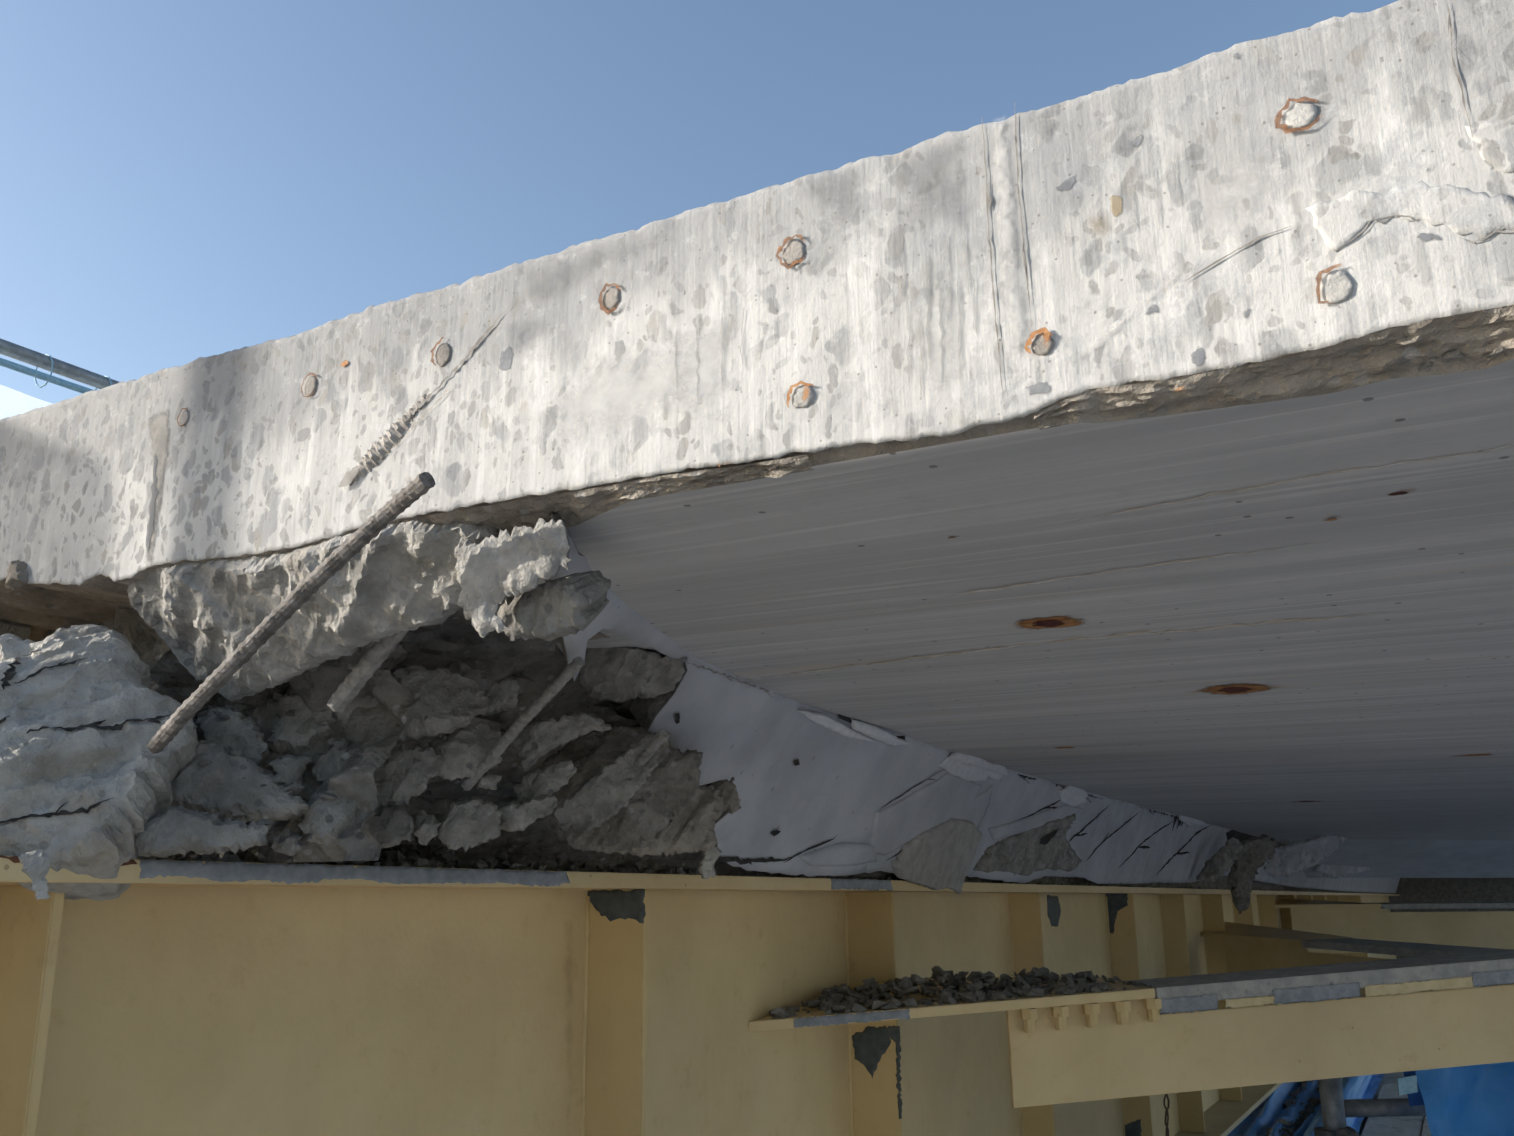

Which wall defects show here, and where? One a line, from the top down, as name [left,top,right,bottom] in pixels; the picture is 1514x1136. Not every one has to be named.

corrosion [1275,97,1319,134]
crack [1338,210,1422,249]
corrosion [598,283,620,314]
corrosion [1316,263,1354,304]
corrosion [1024,327,1055,356]
corrosion [786,381,815,408]
spalling [147,454,815,754]
corrosion [1016,616,1084,630]
spalling [461,657,585,791]
peeling [121,859,570,887]
peeling [587,889,646,923]
peeling [793,1009,910,1119]